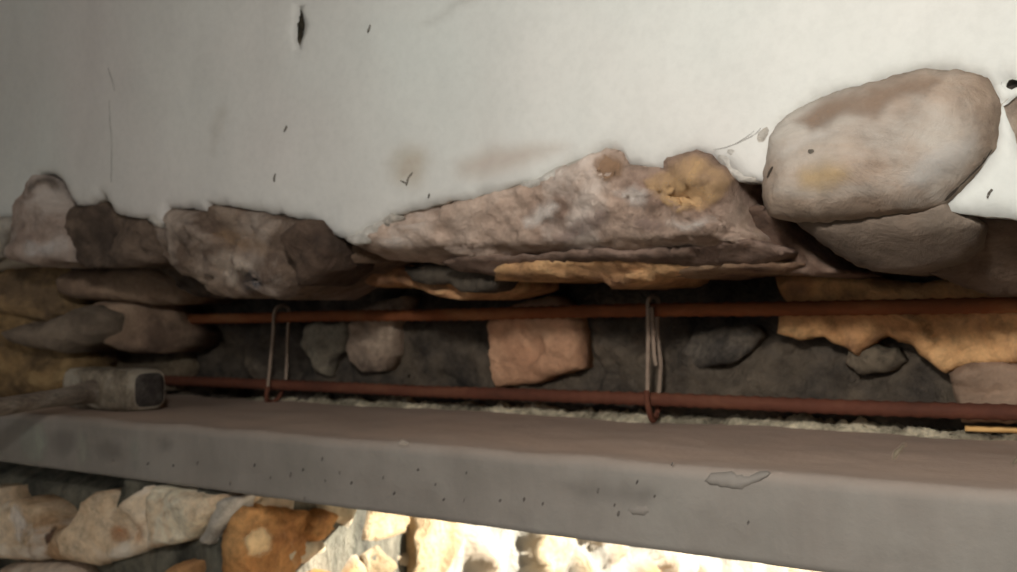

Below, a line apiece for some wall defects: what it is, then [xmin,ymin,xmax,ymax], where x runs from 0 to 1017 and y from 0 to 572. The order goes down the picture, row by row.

hole [297,9,305,45]
flaking render [757,127,769,142]
flaking render [717,149,762,185]
flaking render [344,213,406,246]
spalling [188,297,1017,324]
spalling [164,375,1017,421]